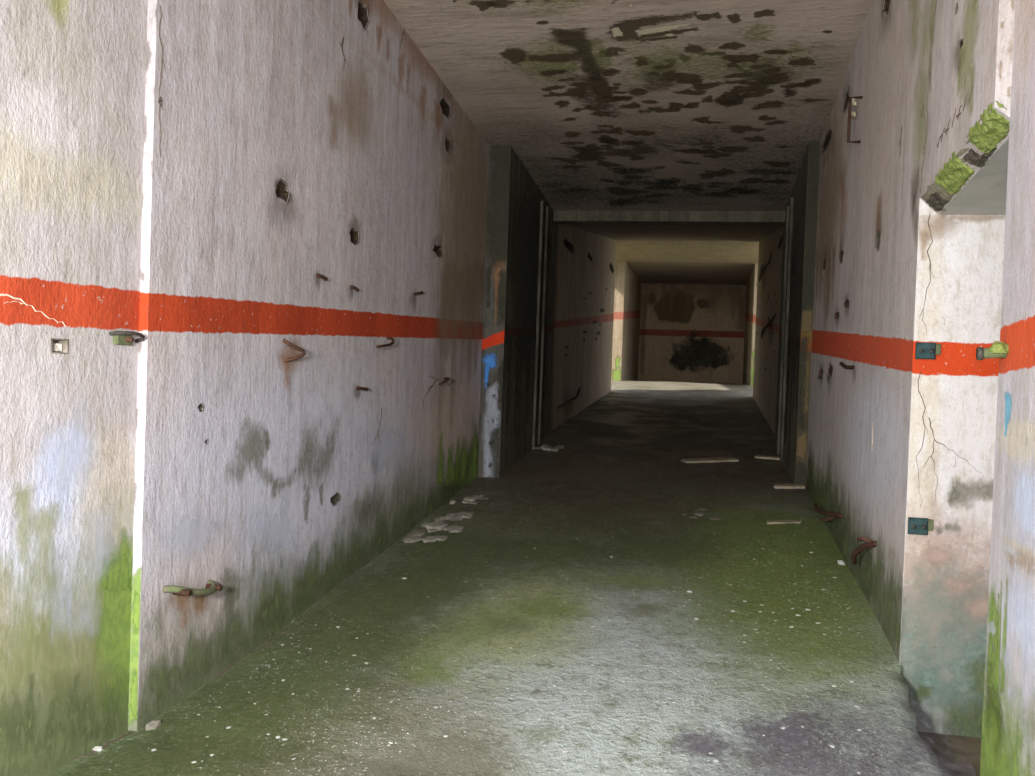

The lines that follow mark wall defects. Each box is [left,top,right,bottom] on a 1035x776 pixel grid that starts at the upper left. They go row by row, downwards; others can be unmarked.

water stain [241,430,269,473]
water stain [301,437,333,520]
crack [916,371,984,507]
water stain [101,540,133,590]
water stain [150,573,242,694]
water stain [988,595,1007,692]
water stain [980,714,1019,776]